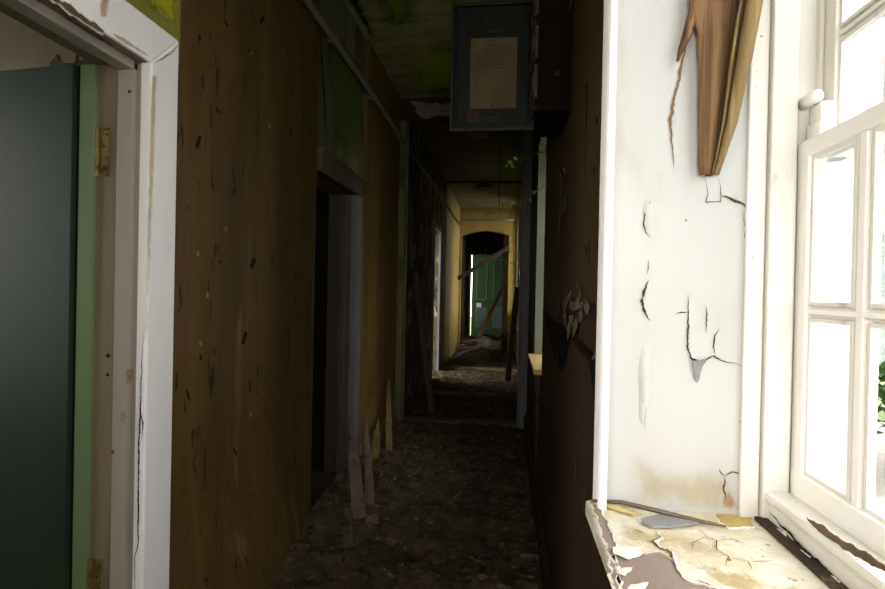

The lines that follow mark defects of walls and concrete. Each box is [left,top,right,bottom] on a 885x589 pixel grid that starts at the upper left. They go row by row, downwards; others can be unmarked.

peeling [50,0,104,36]
flaking render [410,101,450,119]
peeling [544,280,597,340]
crack [640,280,653,321]
crack [677,295,742,383]
peeling [590,503,718,589]
crack [635,529,754,585]
peeling [714,513,756,530]
crack [771,514,834,576]
peeling [807,518,885,572]